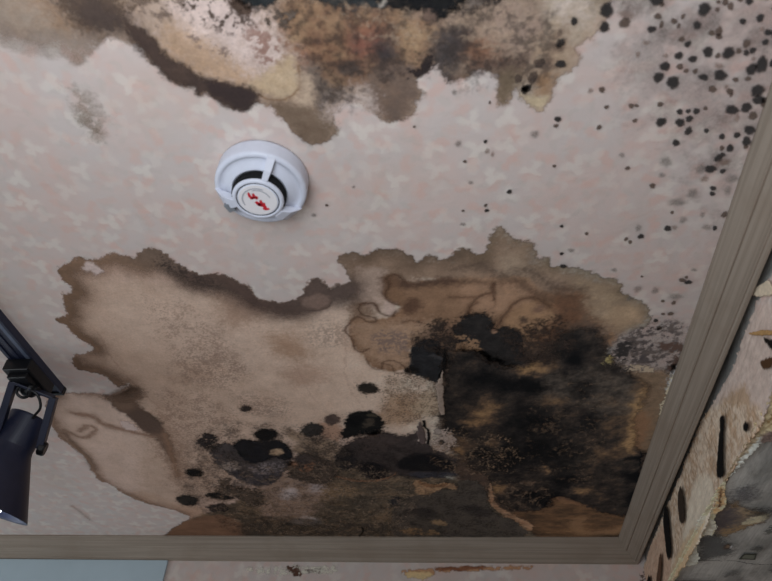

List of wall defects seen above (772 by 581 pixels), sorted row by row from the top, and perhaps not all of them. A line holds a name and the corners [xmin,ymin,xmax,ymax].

leakage [0,0,772,196]
leakage [45,226,683,537]
peeling [752,280,772,297]